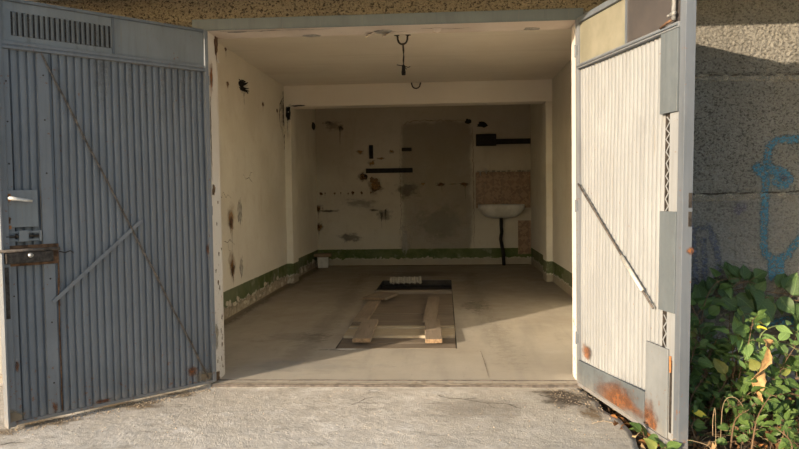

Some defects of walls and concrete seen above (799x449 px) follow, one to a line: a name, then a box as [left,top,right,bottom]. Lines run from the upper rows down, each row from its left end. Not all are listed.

peeling [215,257,317,381]
spalling [377,280,457,348]
rust [604,384,656,430]